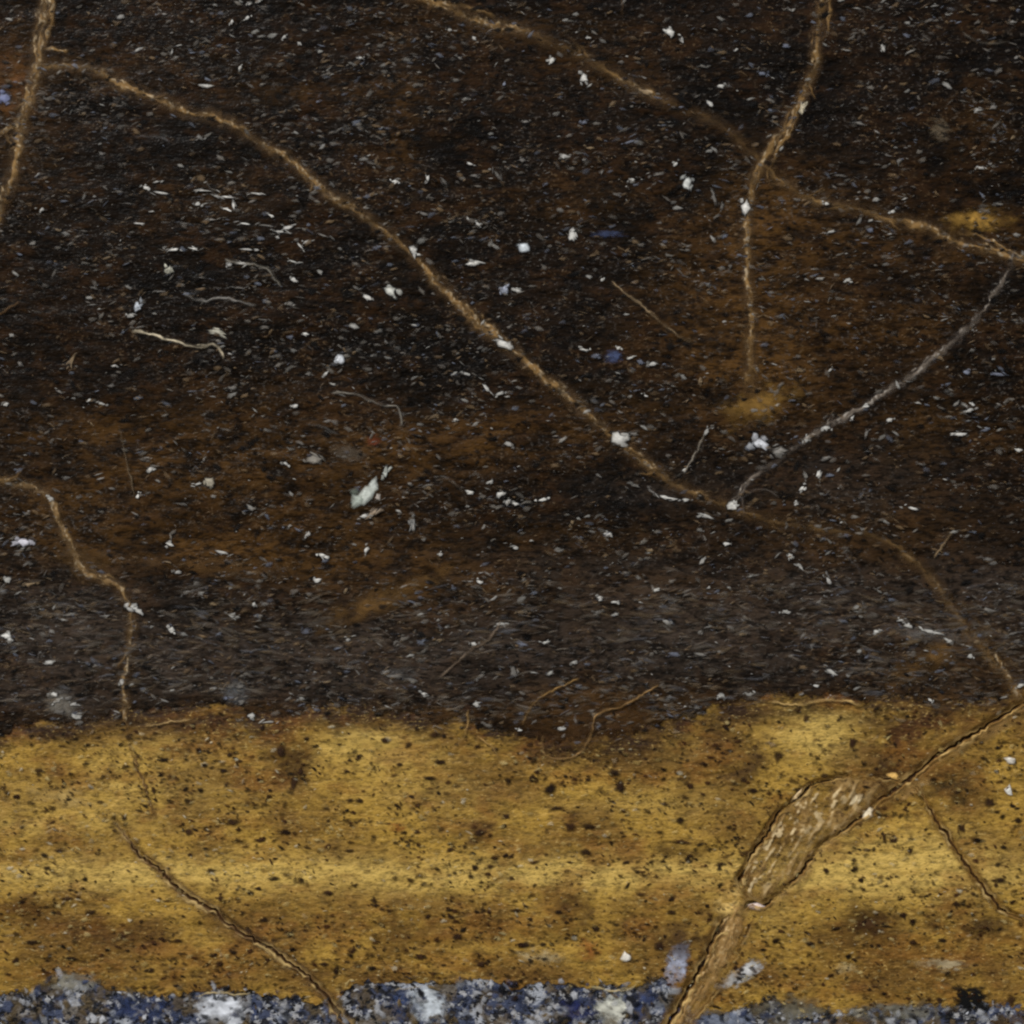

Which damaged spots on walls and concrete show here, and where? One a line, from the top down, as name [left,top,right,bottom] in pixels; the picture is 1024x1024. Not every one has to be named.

crack [0,0,702,496]
crack [741,0,832,381]
crack [794,196,1024,449]
crack [0,477,136,722]
crack [732,468,776,522]
crack [133,755,152,806]
crack [117,824,352,1024]
crack [666,617,1024,1024]